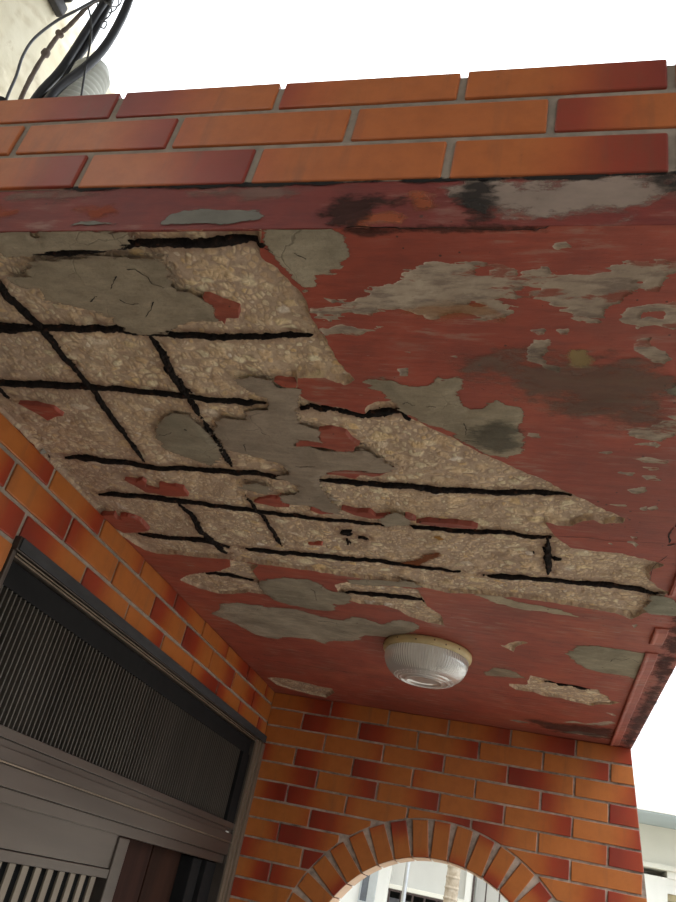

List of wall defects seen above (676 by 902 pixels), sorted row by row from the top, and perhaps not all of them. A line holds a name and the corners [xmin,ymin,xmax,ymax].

leakage [65,180,380,192]
peeling [192,186,293,200]
crack [346,223,424,231]
leakage [319,171,676,237]
peeling [446,173,676,219]
crack [90,269,163,316]
leakage [462,349,676,430]
spalling [0,229,676,628]
crack [559,526,676,579]
spalling [509,675,620,738]
leakage [531,618,676,747]